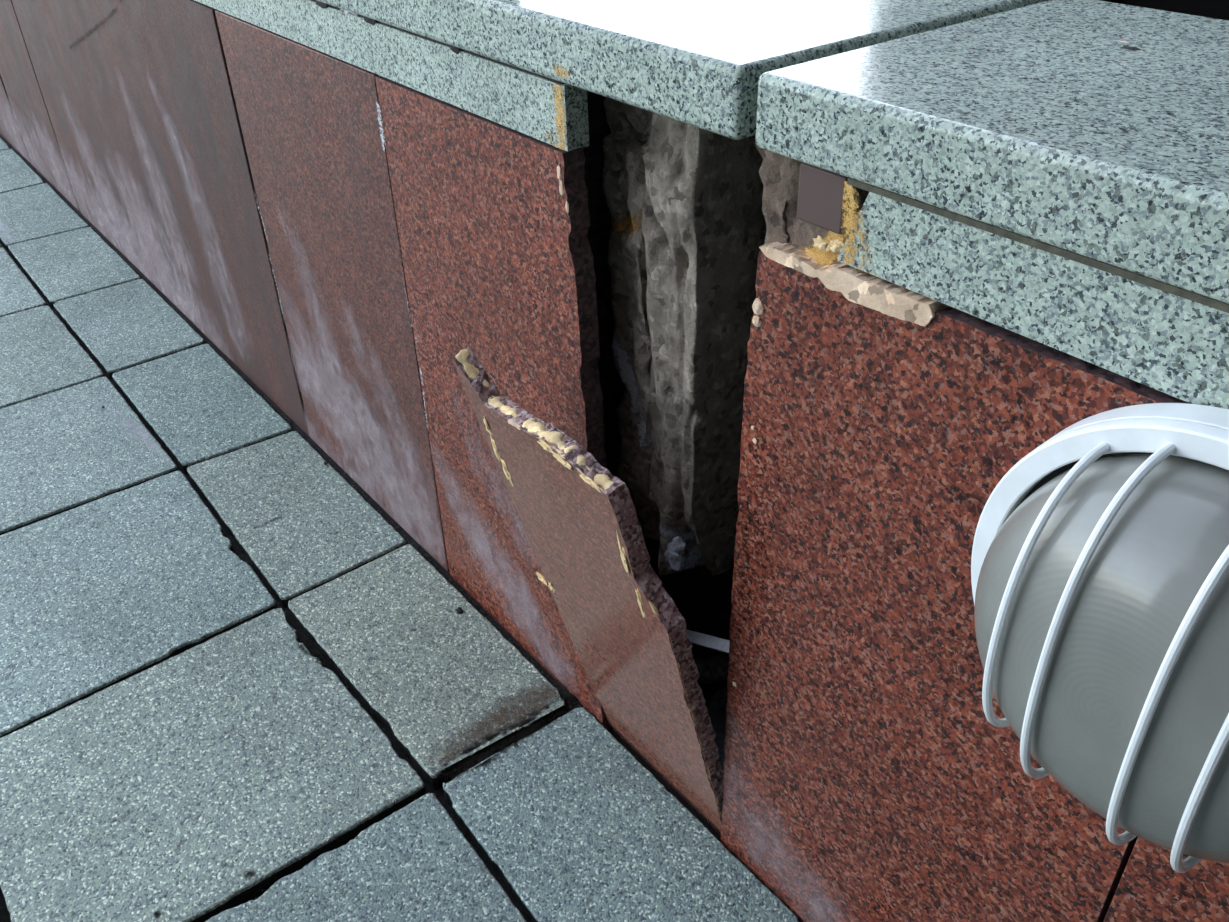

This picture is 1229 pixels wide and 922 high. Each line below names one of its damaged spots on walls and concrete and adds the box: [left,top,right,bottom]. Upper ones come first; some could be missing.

water stain [48,150,204,333]
peeling [557,164,569,213]
spalling [602,96,948,576]
water stain [300,352,429,540]
spalling [693,654,736,710]